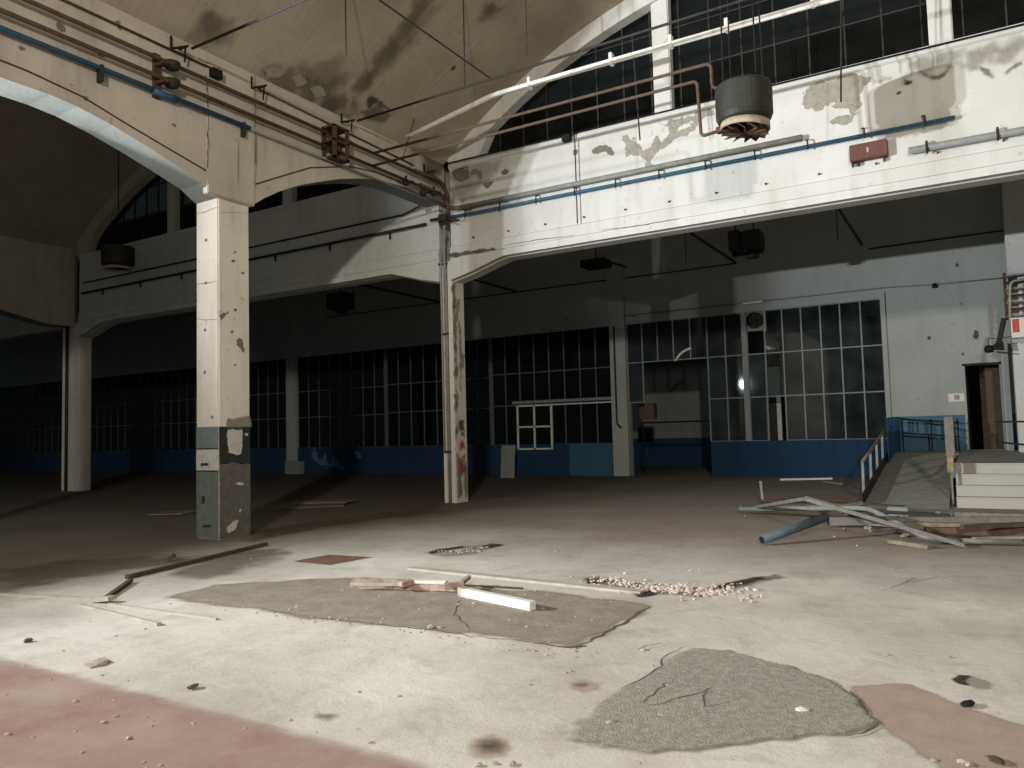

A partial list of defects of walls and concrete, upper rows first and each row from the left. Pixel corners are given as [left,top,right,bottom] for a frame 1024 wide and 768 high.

leakage [273,0,426,121]
crack [204,75,212,168]
peeling [592,108,714,167]
peeling [802,73,871,125]
spalling [452,166,509,189]
peeling [227,429,248,455]